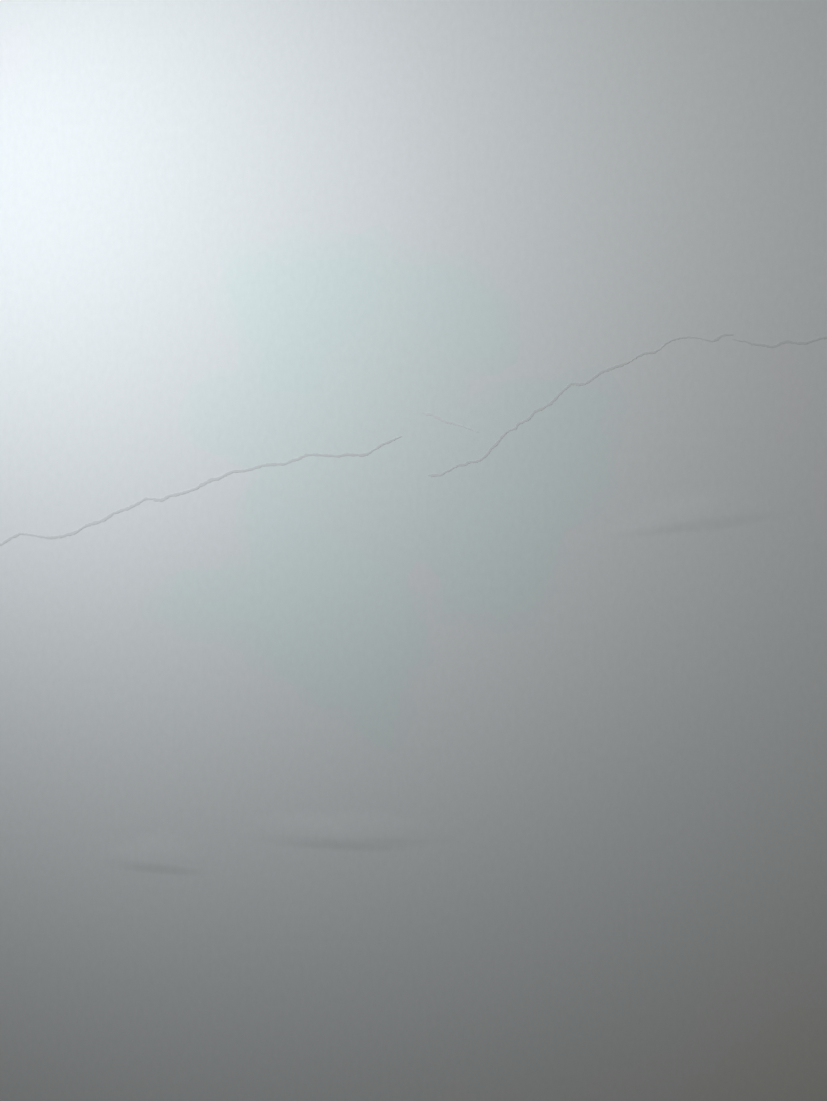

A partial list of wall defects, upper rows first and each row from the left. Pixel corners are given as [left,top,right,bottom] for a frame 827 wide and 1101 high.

crack [428,334,827,477]
crack [0,436,402,546]